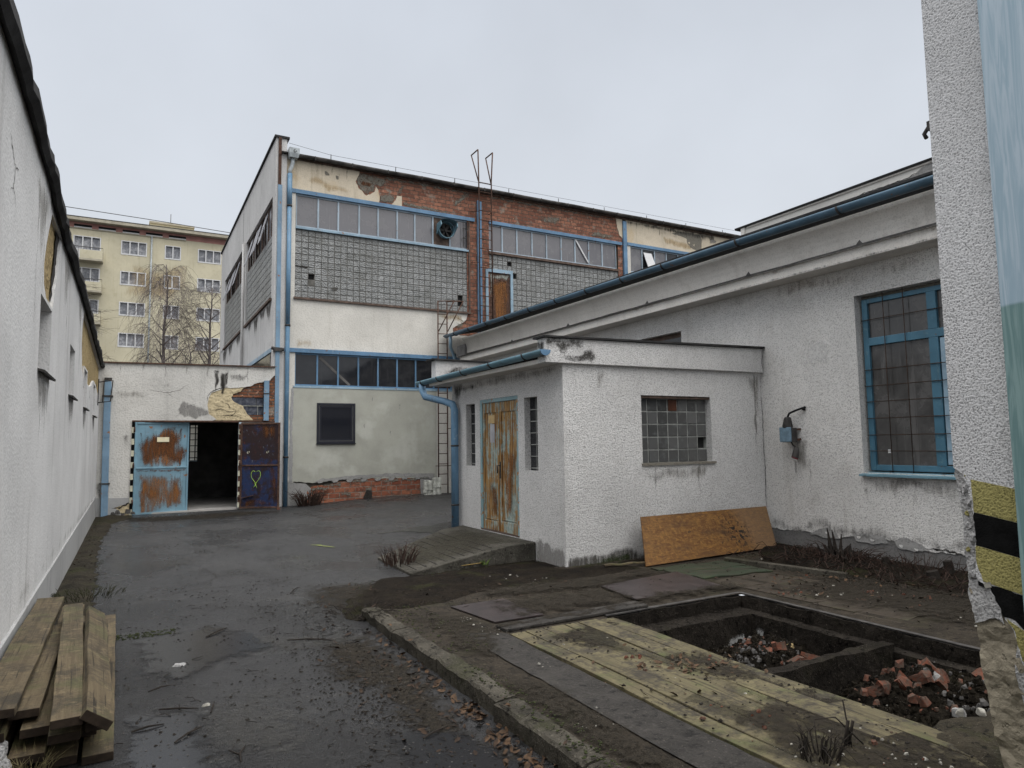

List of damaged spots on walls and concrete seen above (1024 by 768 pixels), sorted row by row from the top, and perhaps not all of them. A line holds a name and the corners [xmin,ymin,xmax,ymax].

flaking render [356,172,623,336]
spalling [179,376,275,421]
corrosion [139,429,185,513]
flaking render [307,473,435,503]
spalling [604,469,1024,768]